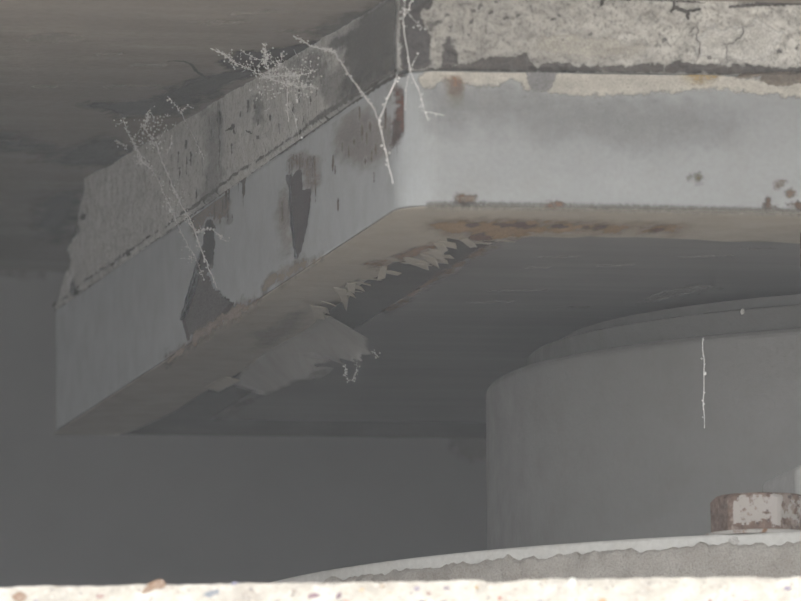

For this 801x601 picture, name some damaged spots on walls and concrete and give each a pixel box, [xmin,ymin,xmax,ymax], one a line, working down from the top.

crack [624,0,706,62]
crack [723,2,801,62]
peeling [286,170,311,259]
rust [776,180,801,210]
peeling [53,206,801,435]